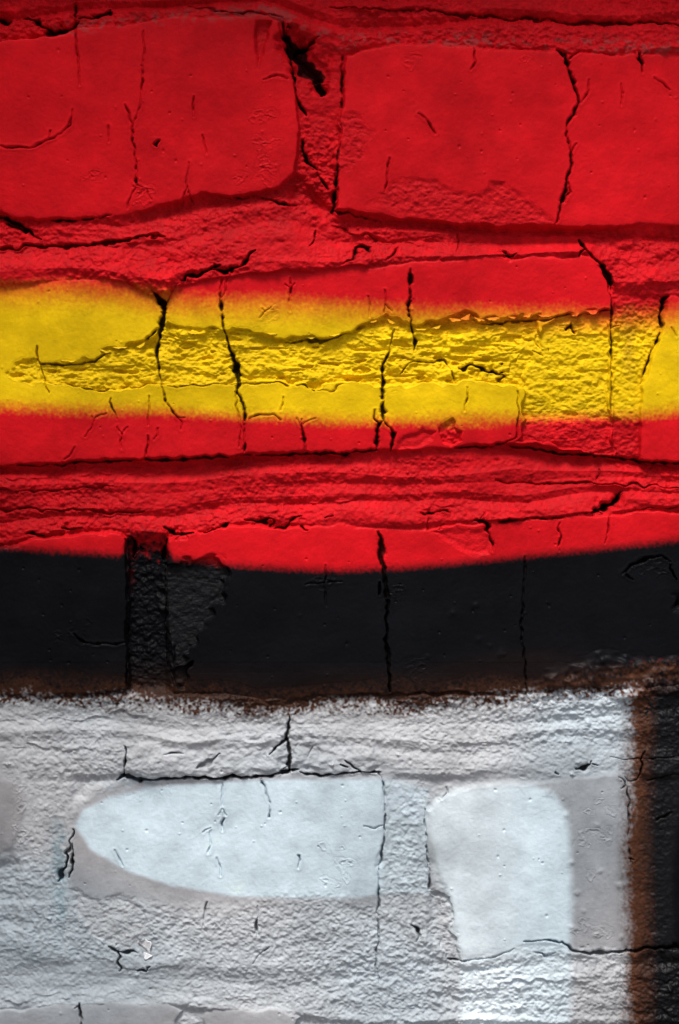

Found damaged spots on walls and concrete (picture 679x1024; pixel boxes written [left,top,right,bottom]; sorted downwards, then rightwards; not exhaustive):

crack [263,73,289,81]
crack [329,5,679,226]
crack [35,277,345,463]
crack [285,208,469,452]
spalling [153,552,232,673]
crack [377,531,392,694]